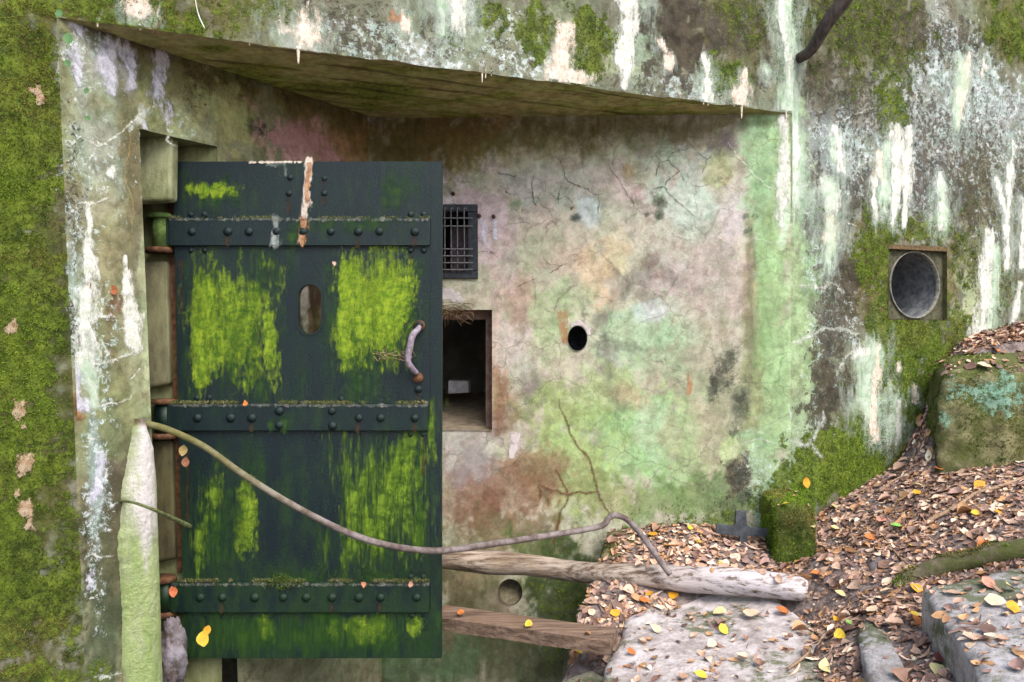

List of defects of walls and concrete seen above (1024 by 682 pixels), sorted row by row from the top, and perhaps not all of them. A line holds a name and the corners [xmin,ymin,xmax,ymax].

water stain [98,35,137,97]
water stain [152,49,172,124]
crack [499,162,600,213]
crack [609,144,766,242]
water stain [820,125,849,269]
water stain [870,123,915,228]
water stain [931,172,949,231]
water stain [967,139,1024,335]
water stain [74,203,102,412]
water stain [122,255,145,353]
water stain [853,334,920,447]
crack [538,405,610,555]